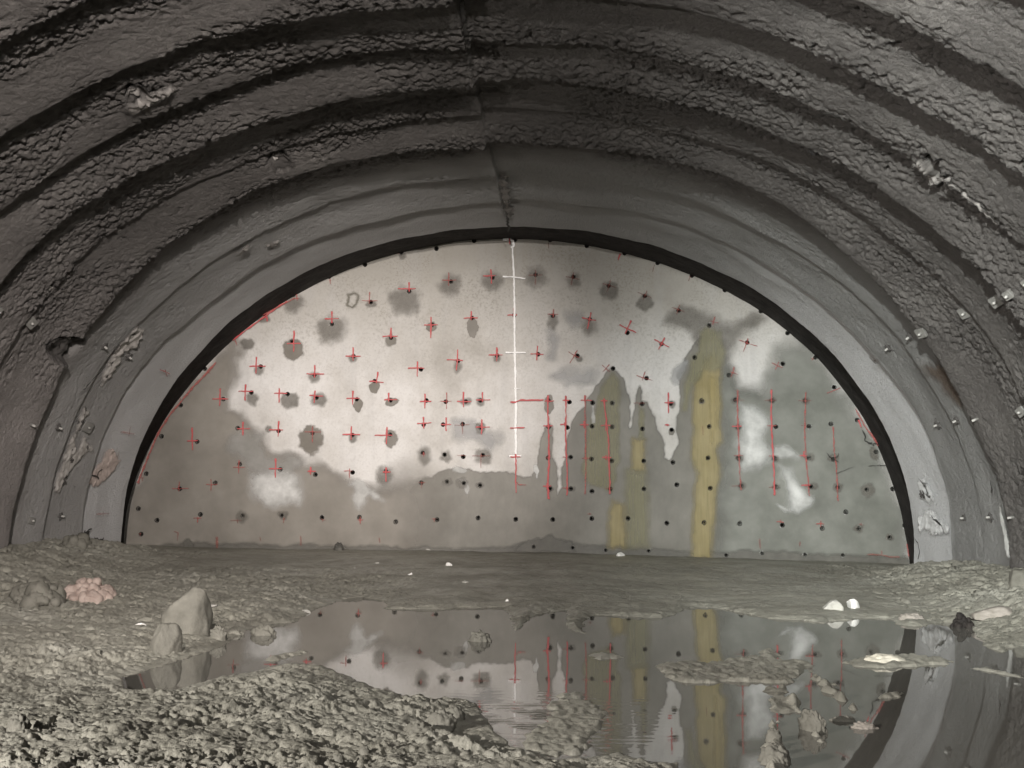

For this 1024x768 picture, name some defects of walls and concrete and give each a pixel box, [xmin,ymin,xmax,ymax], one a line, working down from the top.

spalling [127,83,174,113]
spalling [912,154,946,186]
spalling [101,326,144,386]
spalling [54,408,120,493]
water stain [124,308,910,564]
spalling [917,479,949,535]